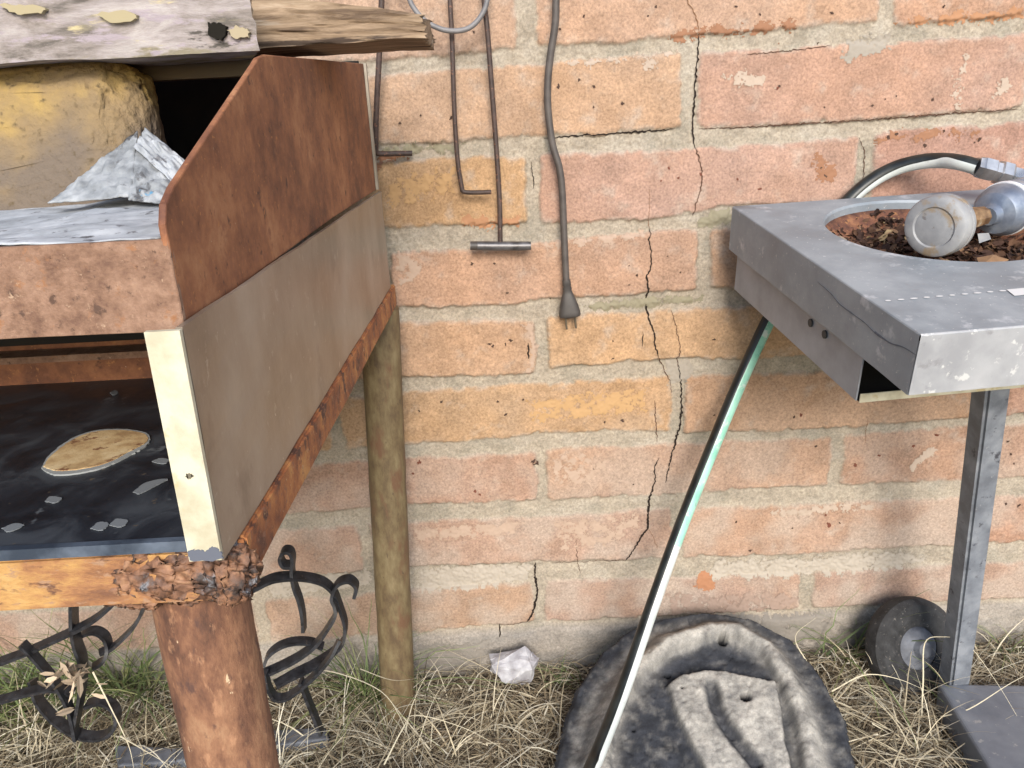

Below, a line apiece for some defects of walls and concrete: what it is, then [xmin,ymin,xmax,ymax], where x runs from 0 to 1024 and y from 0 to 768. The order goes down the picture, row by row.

crack [499,190,683,637]